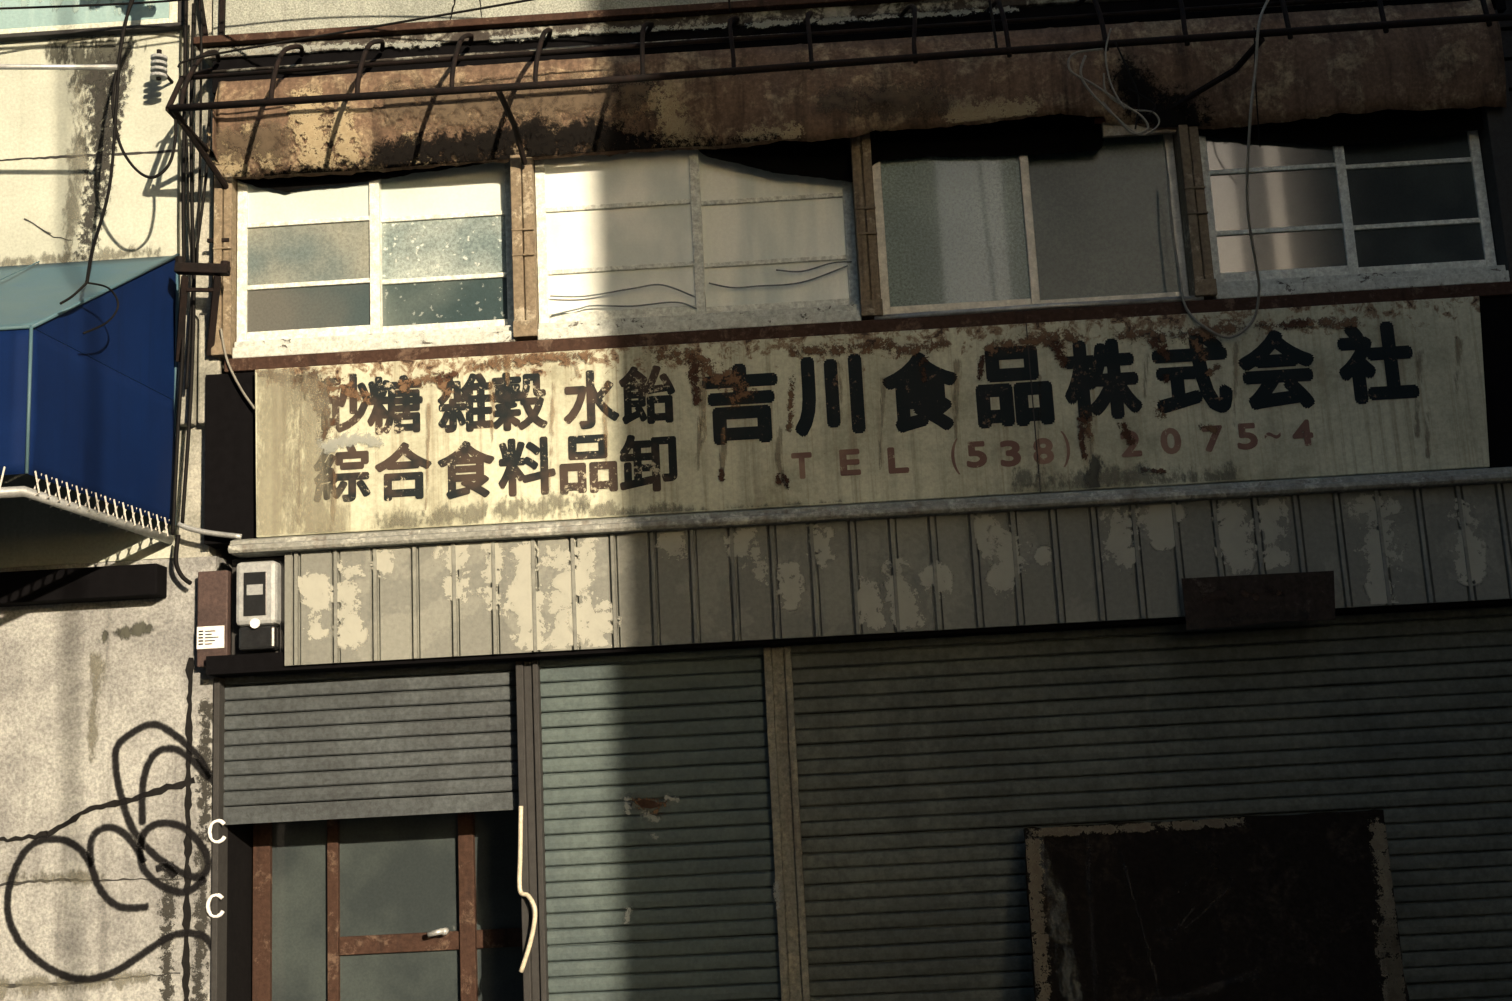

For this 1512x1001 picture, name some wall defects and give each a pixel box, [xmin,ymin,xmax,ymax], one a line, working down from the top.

water stain [21,0,91,12]
water stain [2,33,160,266]
rust [396,351,593,400]
rust [646,344,759,407]
rust [785,336,950,433]
rust [976,329,1083,381]
rust [1111,316,1361,419]
peeling [433,537,621,651]
peeling [723,524,837,611]
peeling [853,557,954,631]
peeling [1098,503,1186,572]
peeling [1212,498,1291,576]